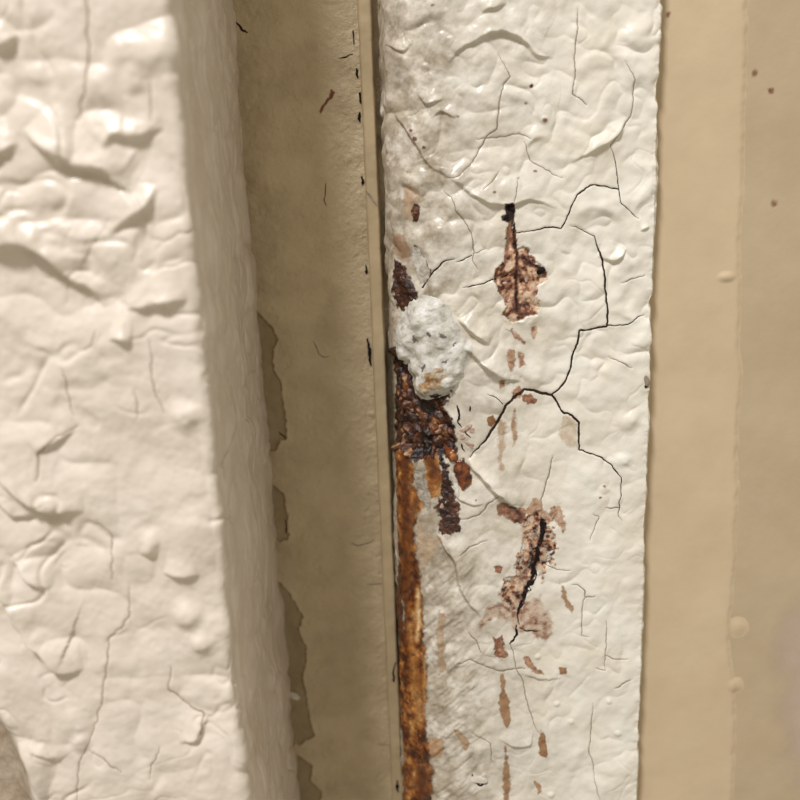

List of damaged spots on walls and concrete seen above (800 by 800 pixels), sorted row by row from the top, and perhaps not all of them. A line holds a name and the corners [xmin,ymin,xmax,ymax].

crack [572,8,587,105]
crack [422,55,562,288]
corrosion [391,235,418,311]
crack [470,63,645,539]
peeling [257,313,287,451]
peeling [272,486,290,542]
peeling [279,583,315,744]
corrosion [388,347,472,800]
spalling [479,498,566,644]
crack [546,564,590,637]
crack [597,622,627,671]
peeling [296,755,322,800]